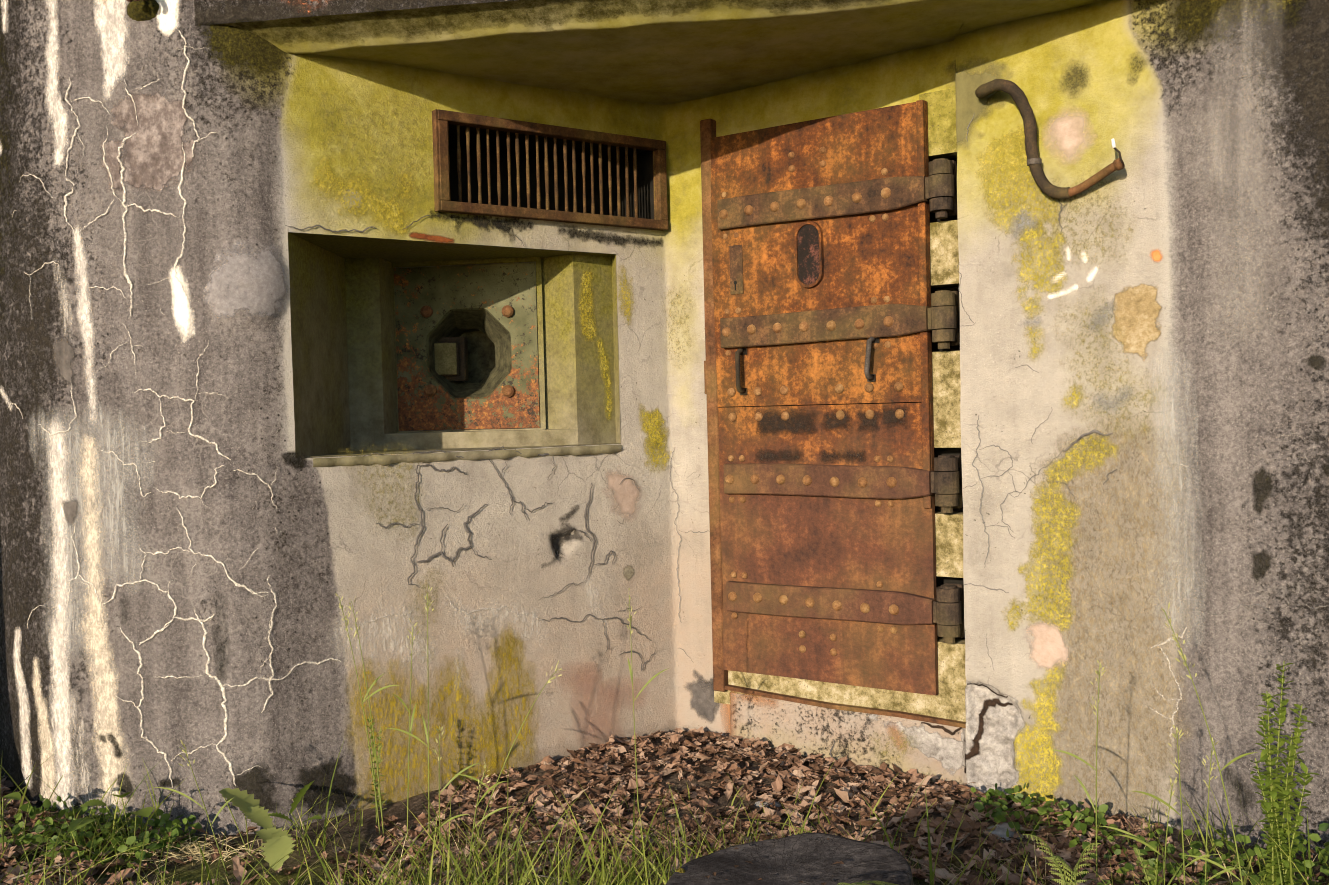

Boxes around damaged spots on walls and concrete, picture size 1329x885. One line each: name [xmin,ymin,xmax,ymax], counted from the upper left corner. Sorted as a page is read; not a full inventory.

efflorescence [46,0,67,165]
efflorescence [95,0,127,97]
efflorescence [156,0,178,34]
crack [1,33,341,788]
efflorescence [170,267,192,338]
damp [1306,354,1326,369]
damp [14,229,138,813]
crack [363,446,707,671]
crack [963,407,1117,593]
damp [1252,467,1272,512]
damp [1253,549,1271,580]
crack [921,634,1013,773]